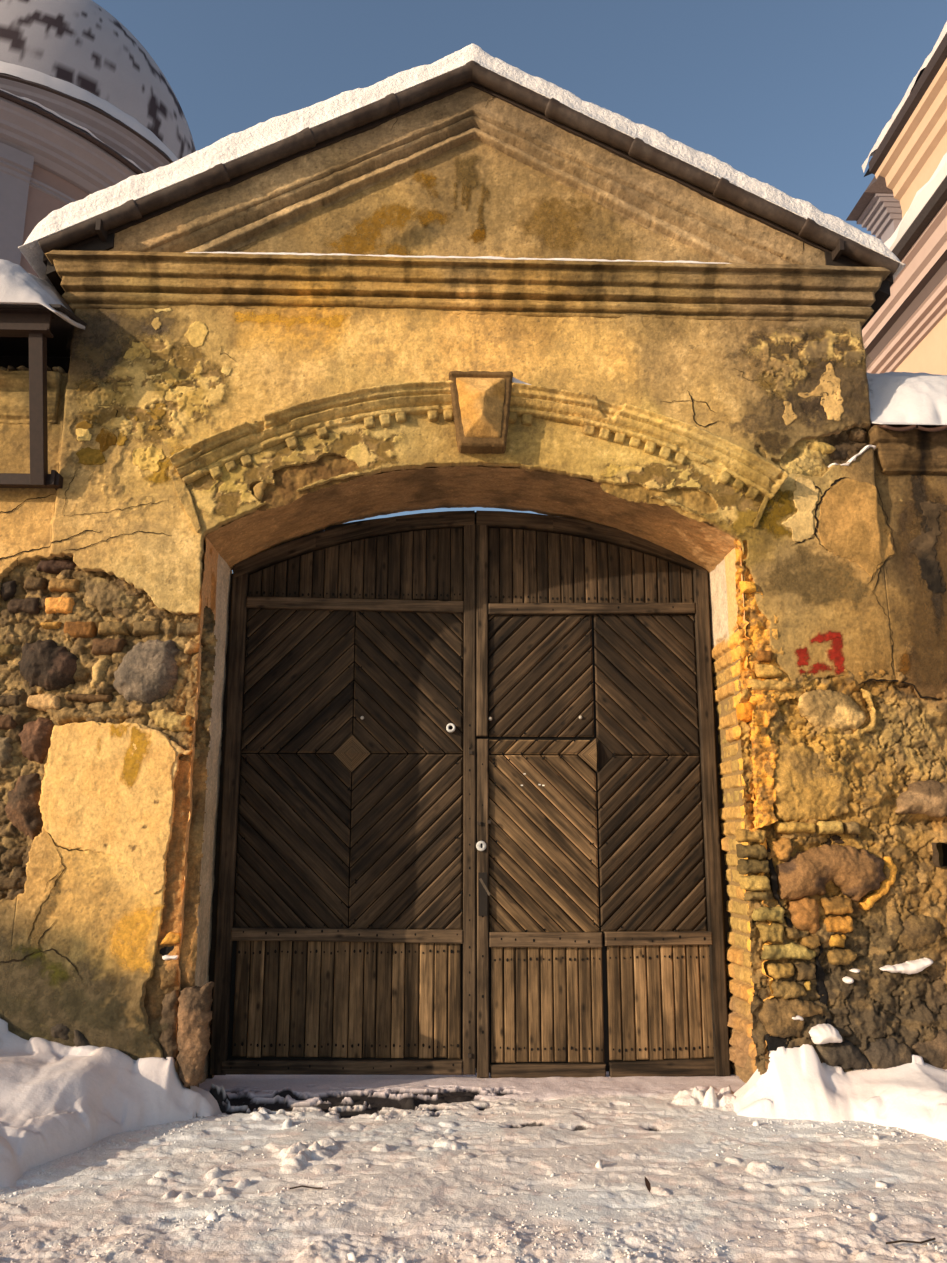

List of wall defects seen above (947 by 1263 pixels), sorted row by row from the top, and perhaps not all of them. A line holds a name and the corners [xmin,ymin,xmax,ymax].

crack [0,475,170,565]
peeling [75,308,232,472]
peeling [187,428,403,517]
crack [661,390,717,427]
peeling [746,329,868,542]
crack [791,477,942,701]
leakage [897,475,947,687]
crack [0,832,83,979]
flaking render [0,556,218,1089]
flaking render [600,463,947,1075]